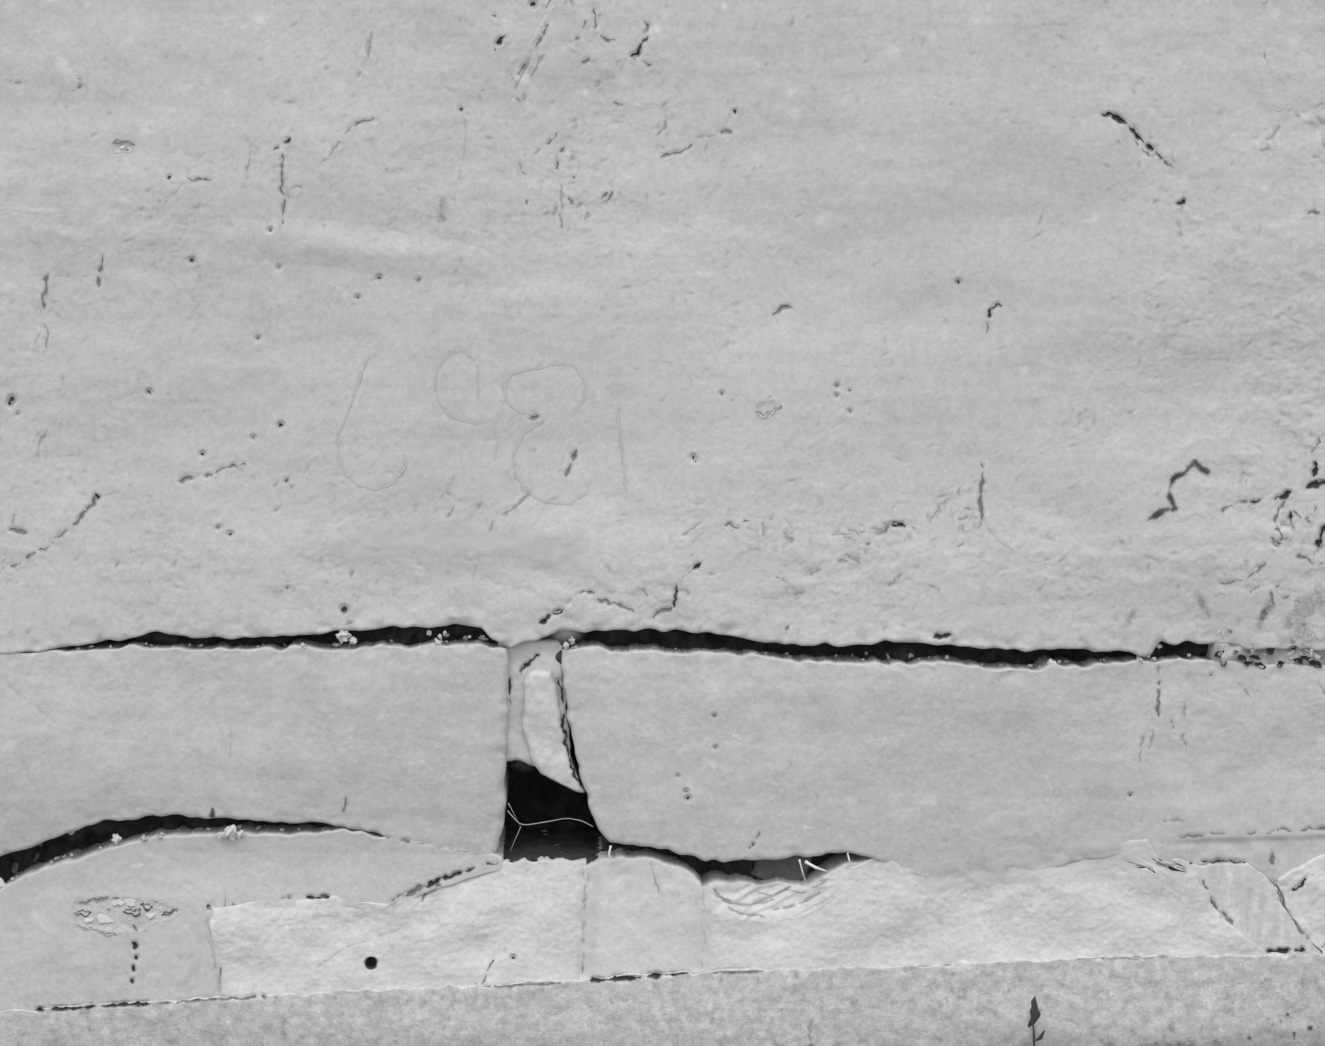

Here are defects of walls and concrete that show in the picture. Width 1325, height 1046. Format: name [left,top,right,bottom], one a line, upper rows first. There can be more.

crack [564,0,651,105]
crack [519,133,613,229]
crack [1101,112,1174,168]
crack [765,463,1013,630]
crack [509,509,794,788]
crack [933,632,953,640]
crack [1139,664,1187,763]
crack [273,837,498,966]
crack [582,876,590,972]
crack [1164,818,1325,924]
crack [1266,875,1325,954]